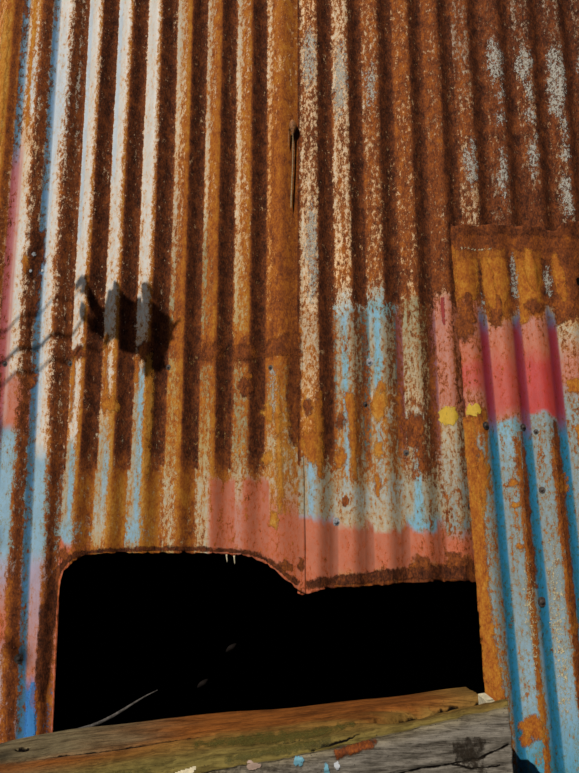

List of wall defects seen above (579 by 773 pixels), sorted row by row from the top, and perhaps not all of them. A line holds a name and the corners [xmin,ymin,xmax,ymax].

rust [21,227,46,345]
peeling [509,252,519,299]
rust [452,232,579,342]
rust [69,345,87,421]
rust [100,334,120,414]
rust [134,340,155,478]
rust [260,332,324,529]
rust [334,392,358,480]
rust [35,412,506,702]
rust [508,432,538,588]
rust [553,420,579,708]
rust [509,714,544,757]